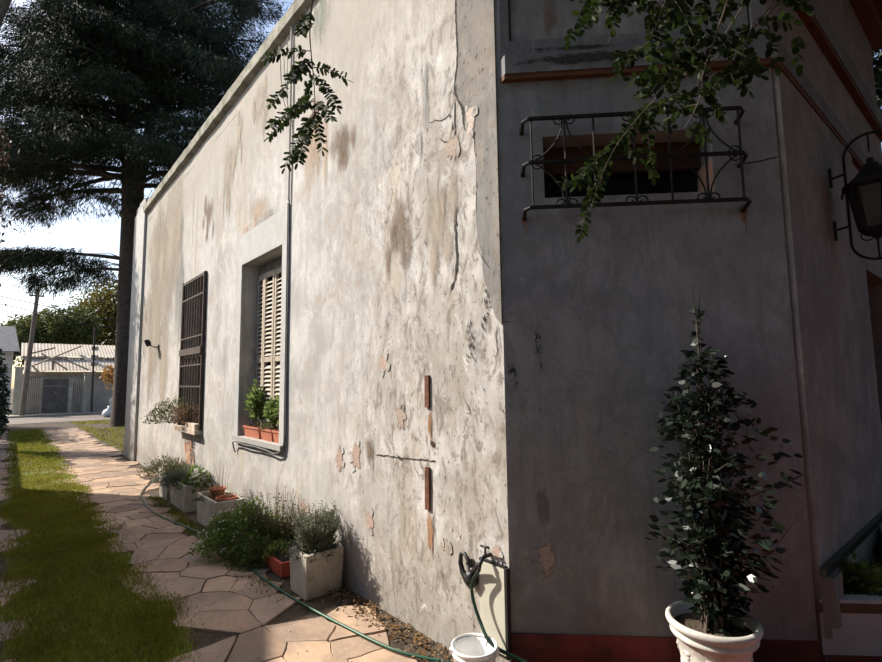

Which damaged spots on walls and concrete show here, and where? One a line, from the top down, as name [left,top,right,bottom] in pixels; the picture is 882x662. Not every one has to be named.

damp [518,44,645,65]
damp [222,114,242,213]
crack [429,0,489,292]